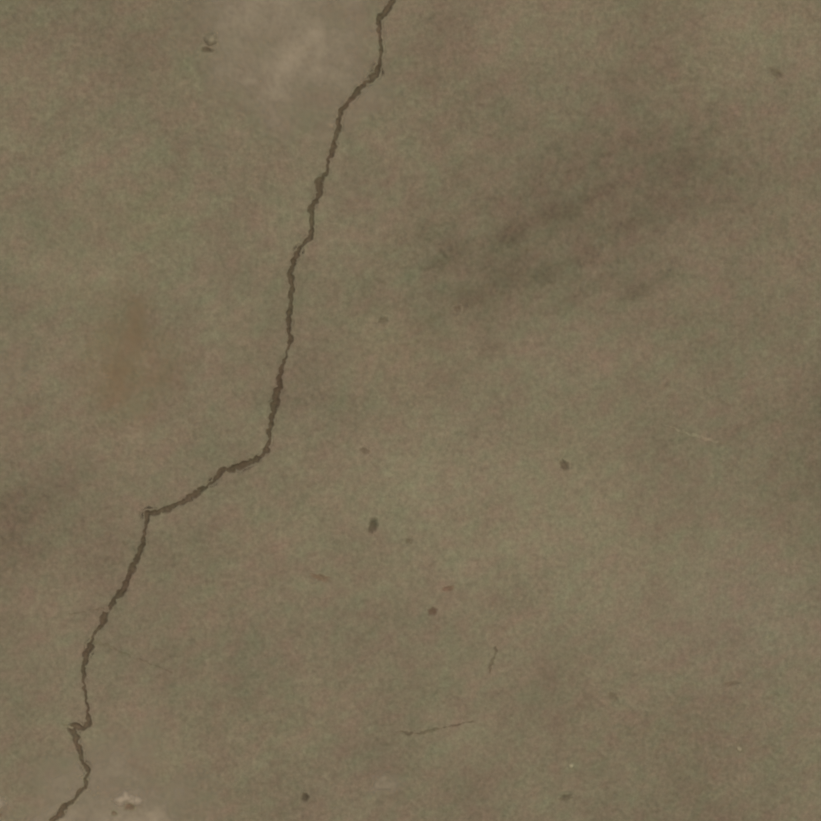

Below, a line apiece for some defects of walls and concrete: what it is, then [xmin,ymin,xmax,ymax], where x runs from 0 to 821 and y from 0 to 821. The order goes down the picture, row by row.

crack [48,0,397,821]
crack [396,720,474,736]